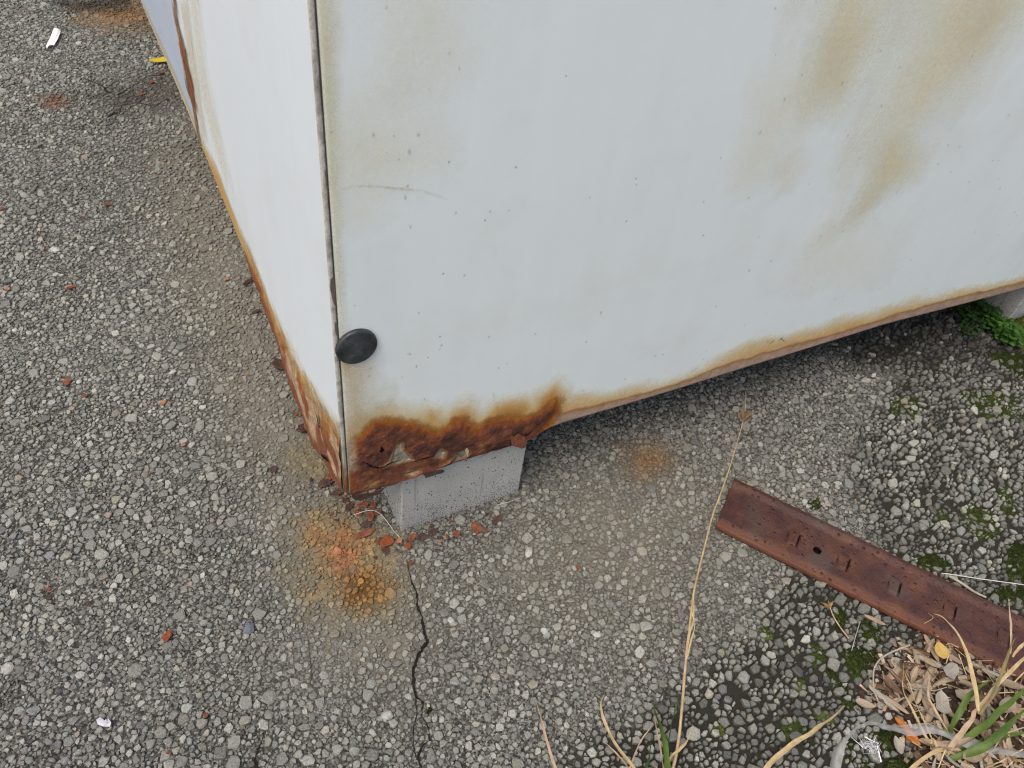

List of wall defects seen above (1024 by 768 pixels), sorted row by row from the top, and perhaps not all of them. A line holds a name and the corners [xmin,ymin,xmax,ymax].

rust [271,358,287,378]
rust [293,473,504,617]
crack [407,562,431,768]